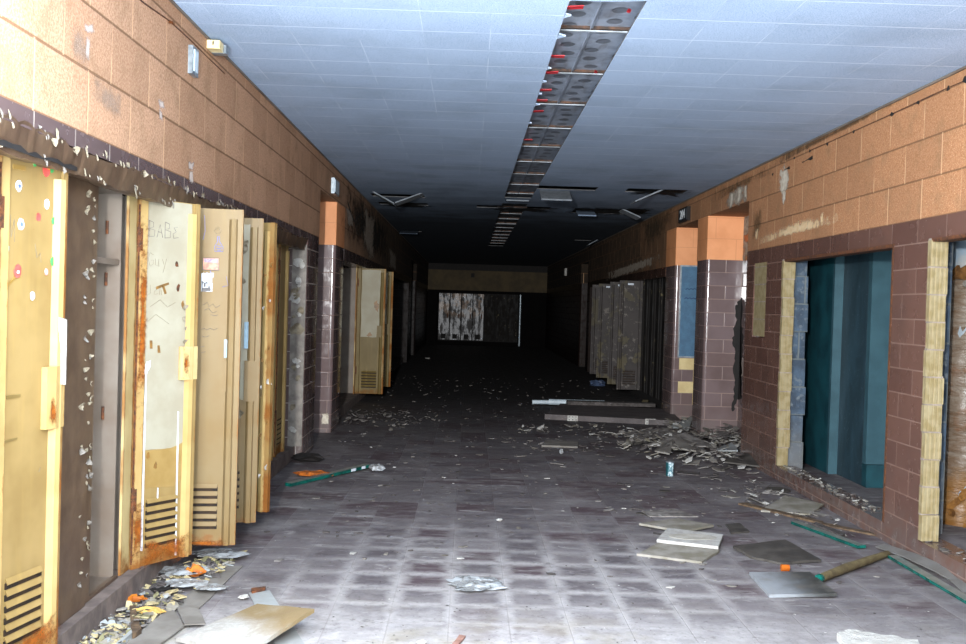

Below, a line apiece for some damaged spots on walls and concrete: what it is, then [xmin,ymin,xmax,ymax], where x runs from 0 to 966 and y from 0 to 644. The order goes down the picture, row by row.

peeling [39,125,63,147]
peeling [85,190,97,245]
peeling [73,145,153,198]
peeling [726,186,748,208]
corrosion [138,249,147,385]
spalling [731,216,767,411]
corrosion [132,504,221,563]